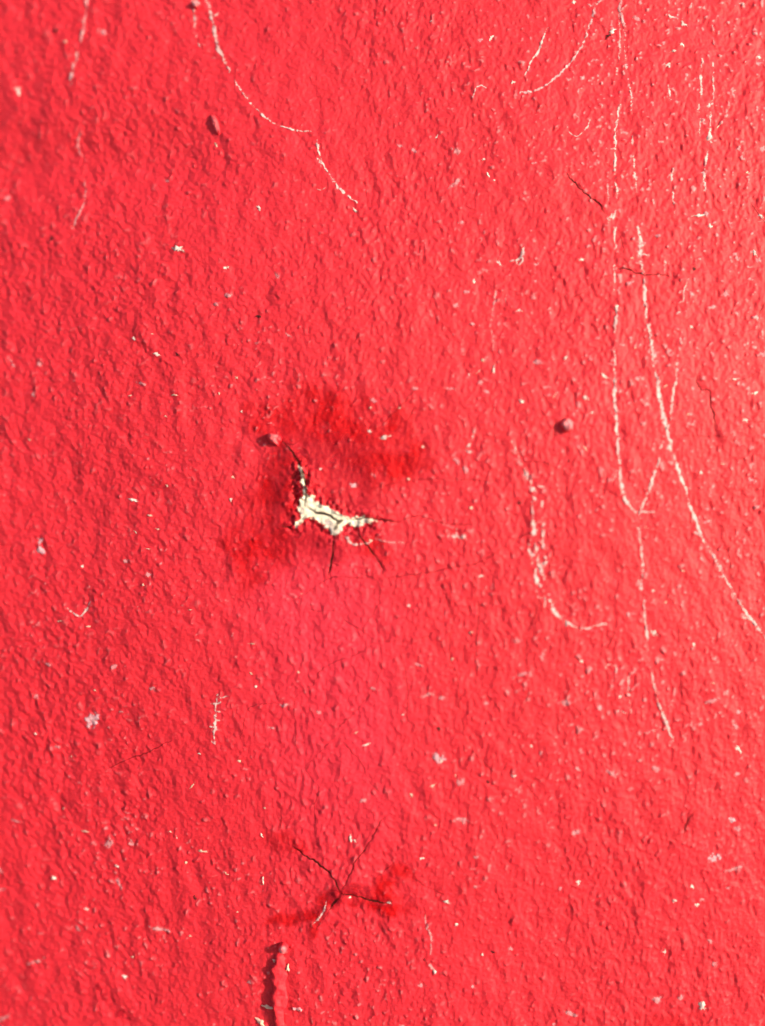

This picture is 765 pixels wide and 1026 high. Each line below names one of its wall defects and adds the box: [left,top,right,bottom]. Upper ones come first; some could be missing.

peeling [281,441,464,578]
crack [294,813,387,914]